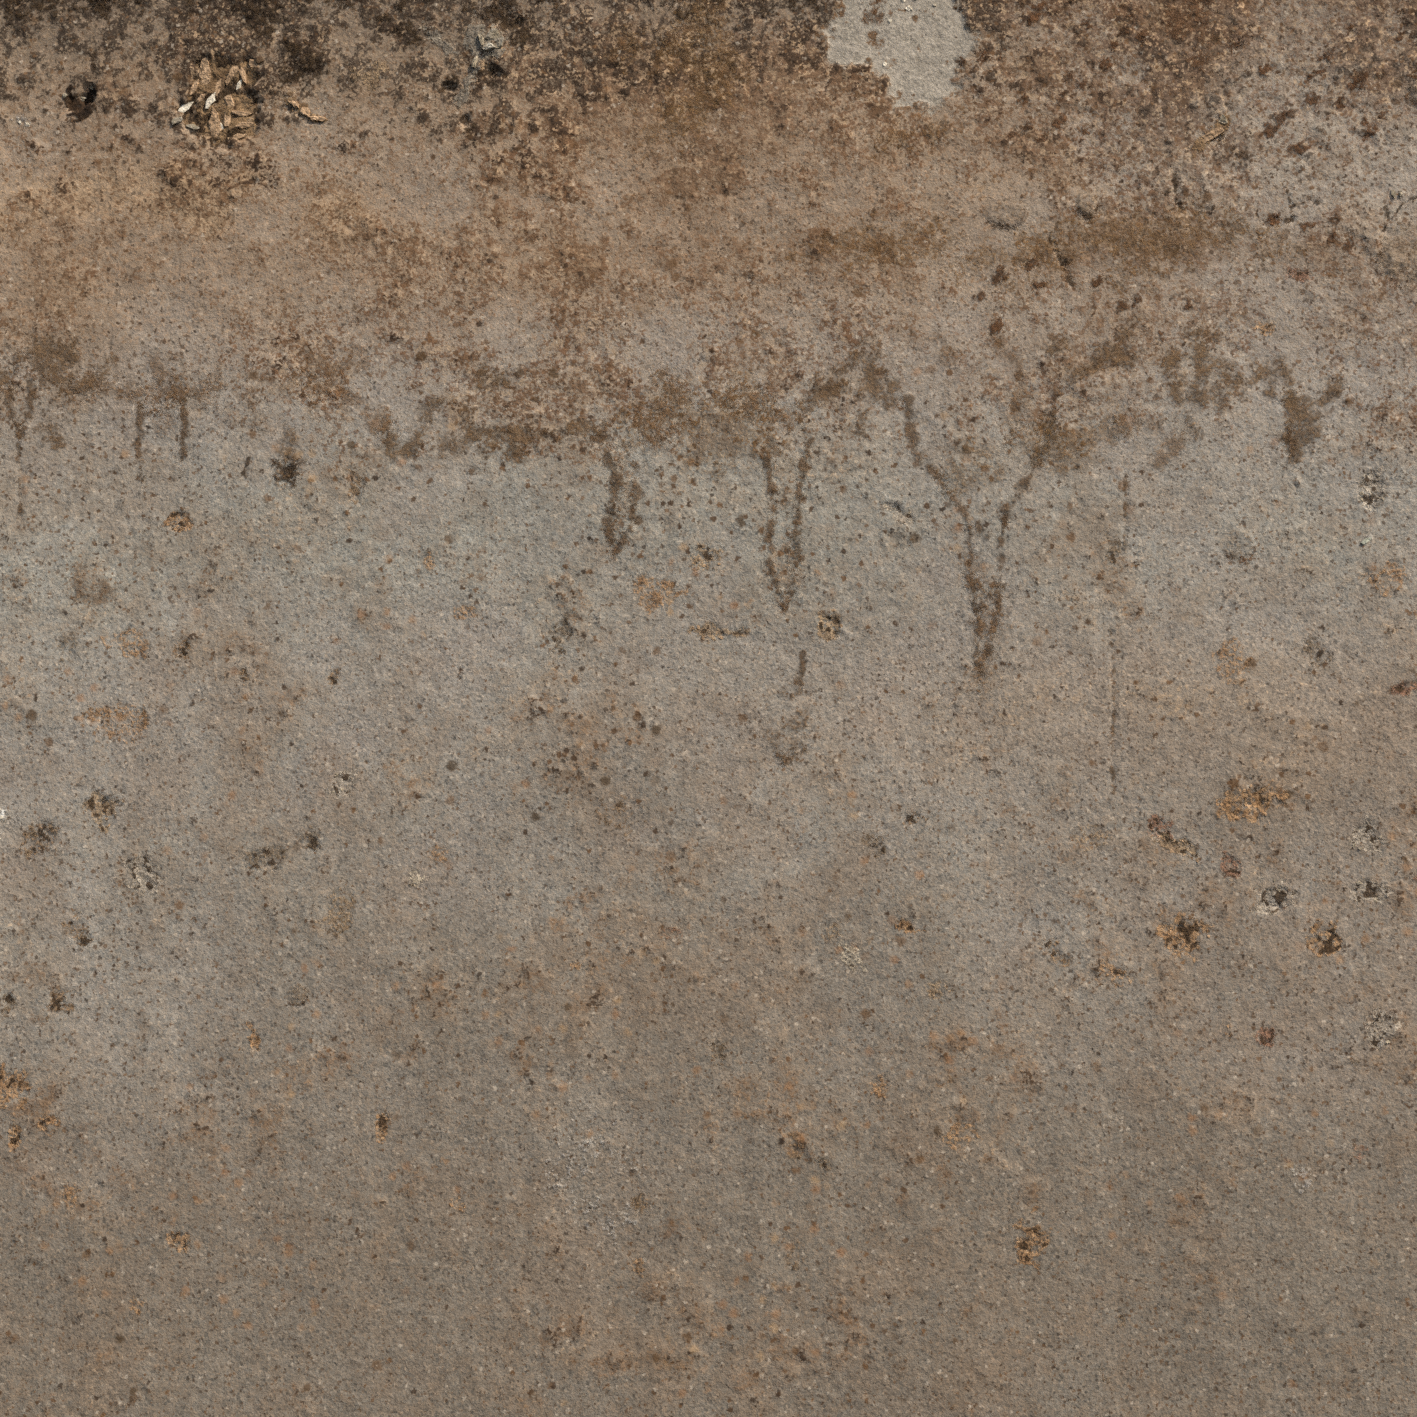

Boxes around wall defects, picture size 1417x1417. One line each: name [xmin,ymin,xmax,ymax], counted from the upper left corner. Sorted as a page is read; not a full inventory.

leakage [277,31,329,89]
leakage [474,6,537,47]
peeling [814,0,1073,115]
spalling [1008,72,1090,142]
spalling [1099,14,1149,70]
leakage [0,334,117,450]
leakage [179,397,189,461]
leakage [272,428,303,487]
leakage [380,363,644,555]
leakage [761,437,814,610]
leakage [794,319,1141,692]
leakage [1162,323,1342,463]